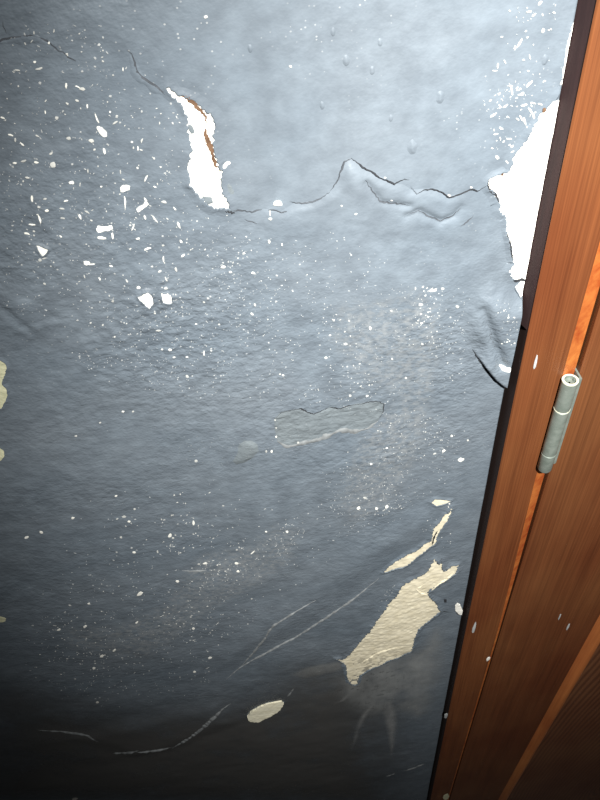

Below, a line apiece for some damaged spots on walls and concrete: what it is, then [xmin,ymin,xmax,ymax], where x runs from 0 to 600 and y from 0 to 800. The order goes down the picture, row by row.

crack [0,26,75,61]
crack [129,52,163,96]
peeling [481,0,573,300]
peeling [0,24,299,394]
crack [236,159,486,225]
peeling [0,357,14,413]
peeling [274,274,469,686]
peeling [189,517,300,595]
peeling [34,572,120,688]
peeling [245,698,285,723]